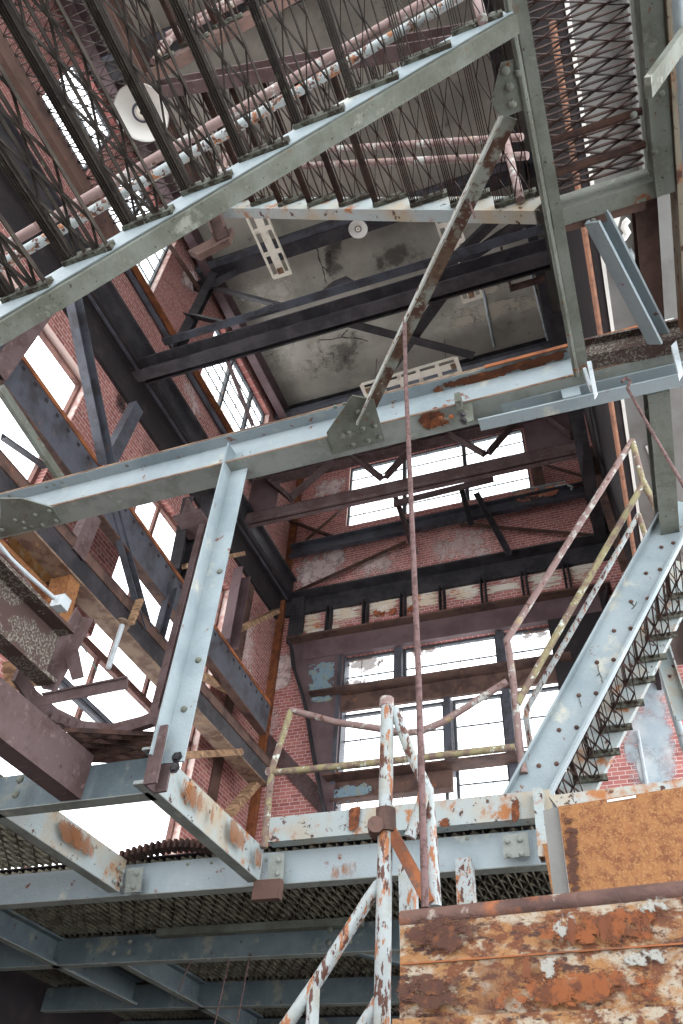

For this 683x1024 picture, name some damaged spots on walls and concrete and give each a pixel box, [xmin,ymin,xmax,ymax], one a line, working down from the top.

damp [378,245,408,268]
corrosion [433,350,567,392]
corrosion [418,411,449,430]
peeling [308,662,335,703]
corrosion [59,820,94,858]
corrosion [349,806,361,831]
corrosion [511,797,520,822]
corrosion [543,779,683,894]
corrosion [404,914,483,952]
corrosion [538,906,676,945]
corrosion [396,974,467,1016]
corrosion [475,954,661,1009]